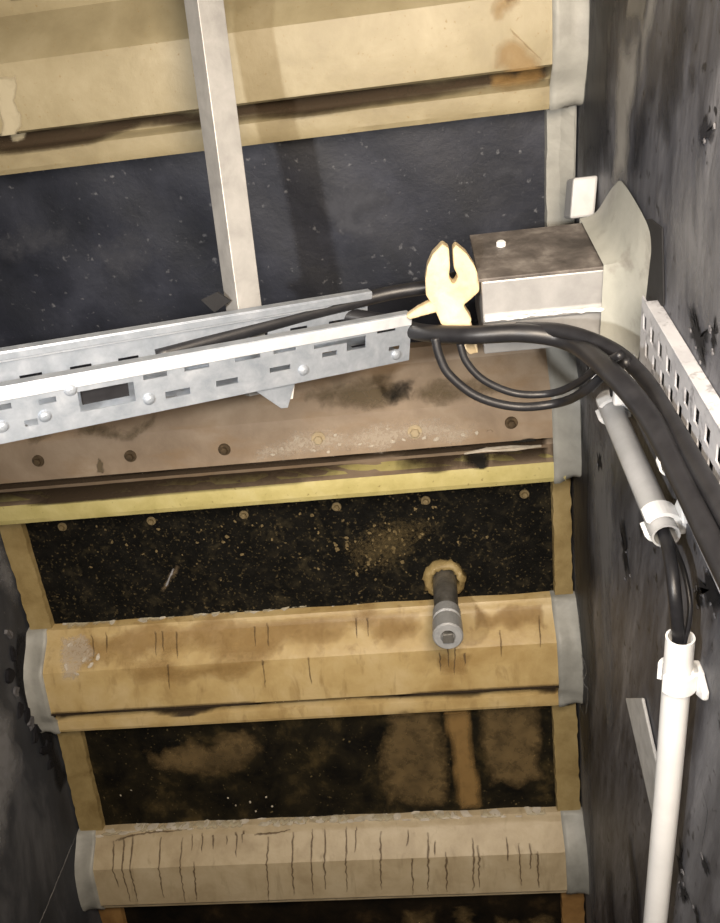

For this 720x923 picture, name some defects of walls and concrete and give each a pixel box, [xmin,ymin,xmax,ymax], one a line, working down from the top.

damp [662,0,693,134]